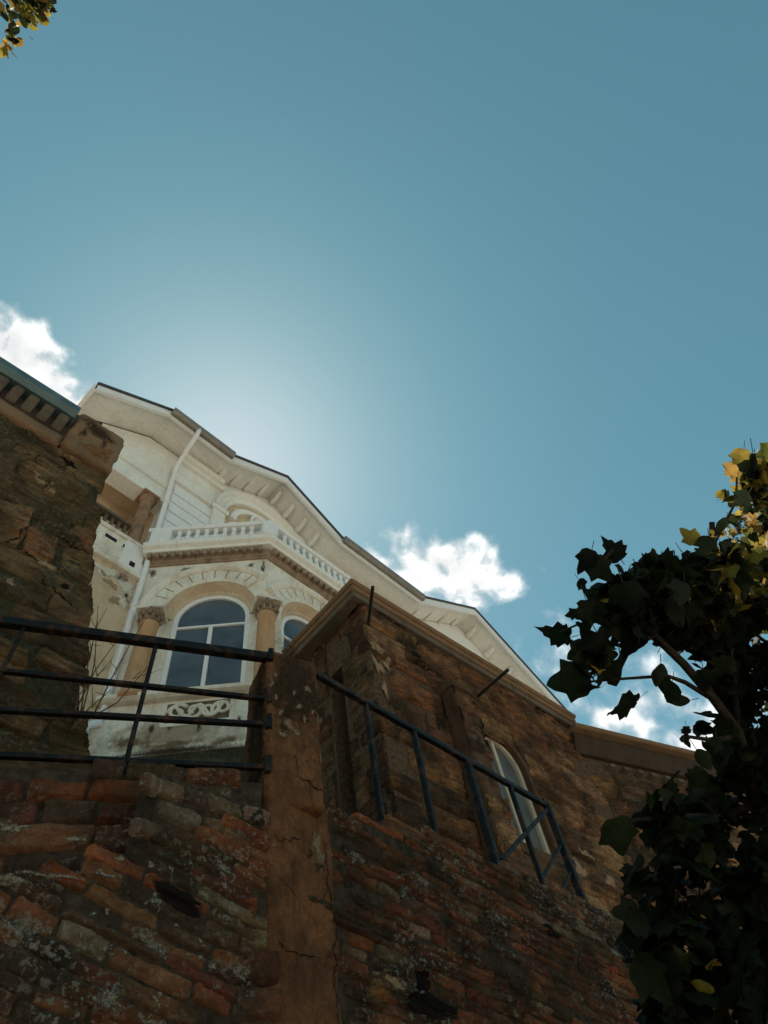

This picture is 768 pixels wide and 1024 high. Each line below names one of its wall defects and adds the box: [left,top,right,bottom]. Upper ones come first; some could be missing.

crack [6,525,86,614]
spalling [154,880,201,917]
crack [276,835,339,1023]